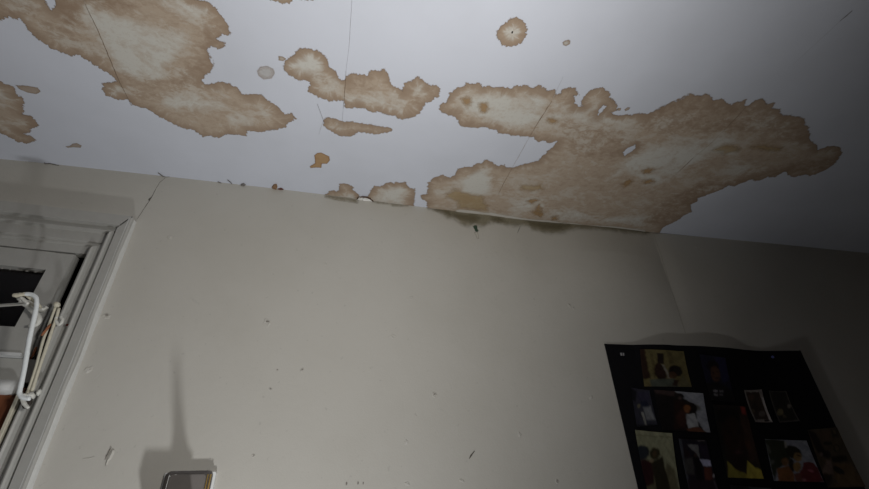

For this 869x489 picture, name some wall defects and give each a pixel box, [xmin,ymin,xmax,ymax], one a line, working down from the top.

damp [0,0,296,144]
damp [497,17,528,47]
damp [279,48,843,233]